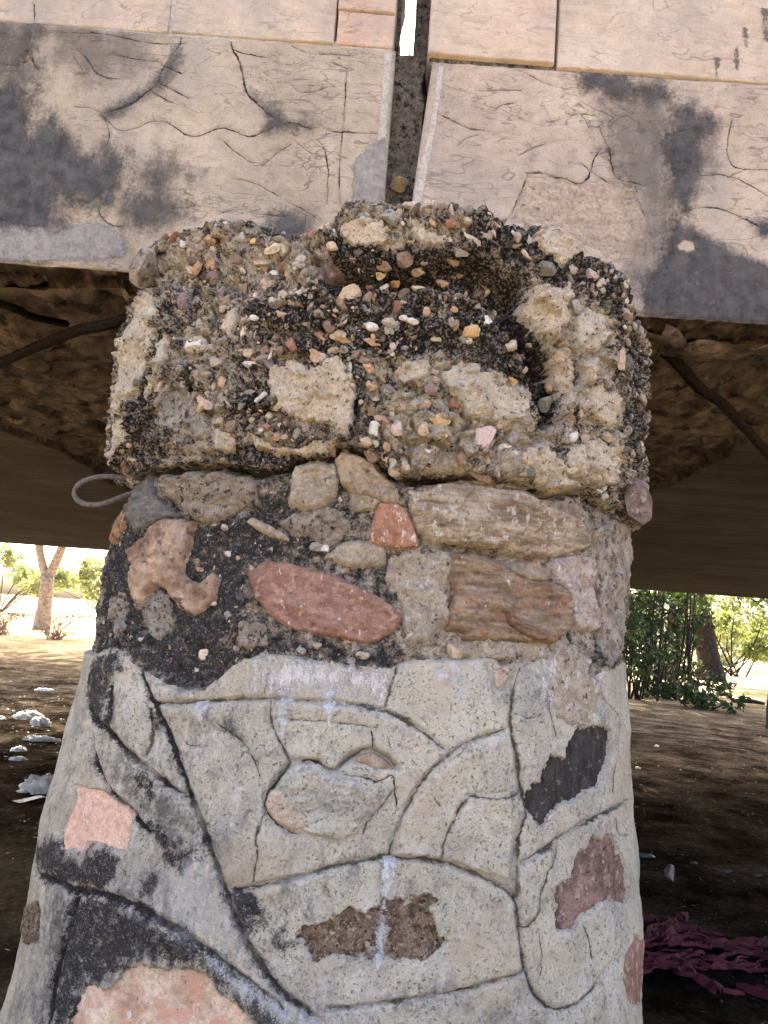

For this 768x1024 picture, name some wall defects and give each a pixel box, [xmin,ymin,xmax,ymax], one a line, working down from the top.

water stain [0,22,188,232]
crack [33,5,377,220]
water stain [262,105,306,132]
crack [439,114,644,214]
water stain [580,72,669,99]
crack [700,120,767,196]
spalling [511,177,648,261]
water stain [642,102,768,324]
crack [676,206,761,228]